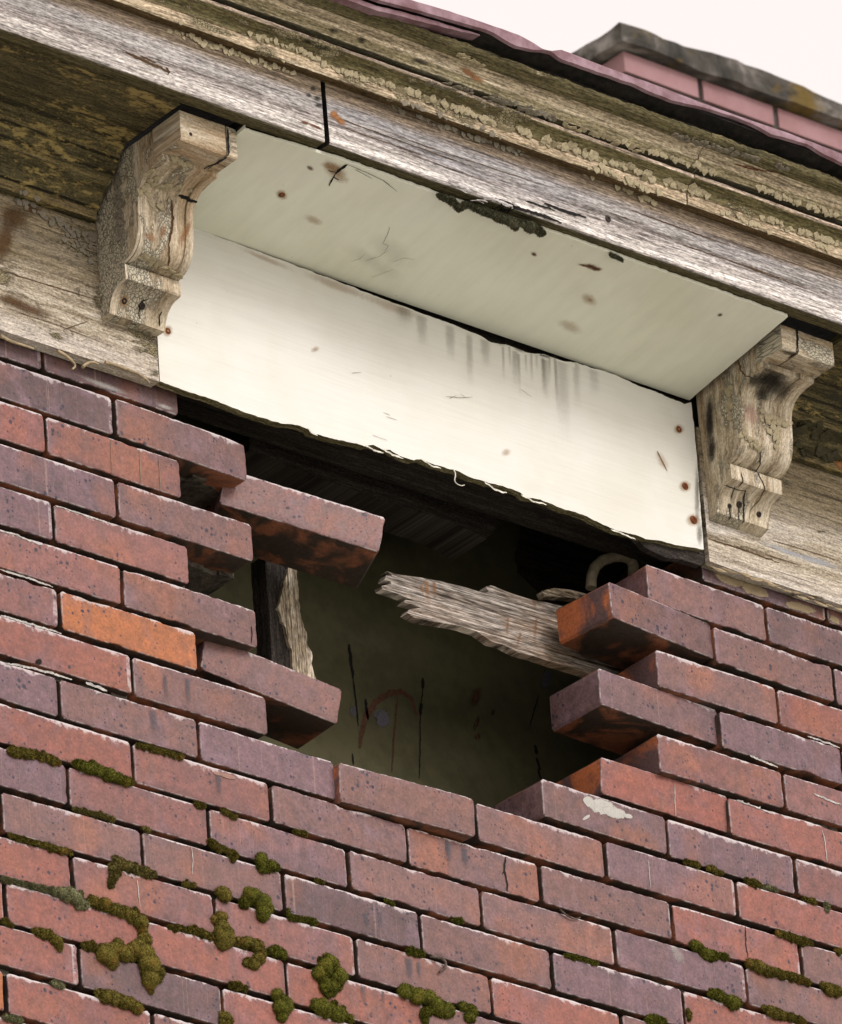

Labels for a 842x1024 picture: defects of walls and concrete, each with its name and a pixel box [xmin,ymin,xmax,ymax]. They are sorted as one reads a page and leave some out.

peeling [167,21,717,207]
crack [204,129,230,169]
crack [329,164,396,191]
peeling [755,184,840,218]
crack [168,195,197,266]
peeling [720,210,842,253]
crack [787,325,799,359]
flaking render [514,525,627,605]